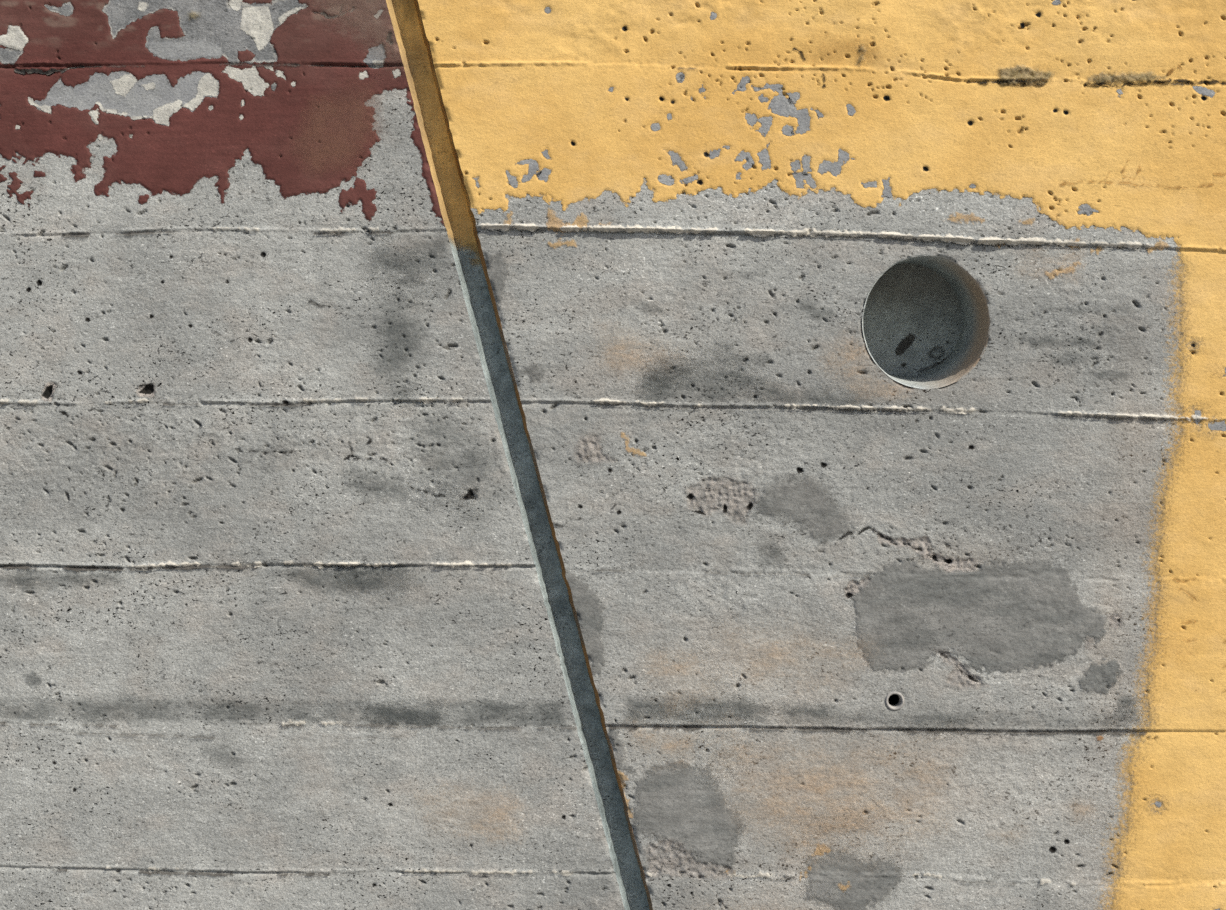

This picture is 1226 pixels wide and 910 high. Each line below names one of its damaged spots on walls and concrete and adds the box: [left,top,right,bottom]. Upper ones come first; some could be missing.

peeling [0,25,28,65]
peeling [28,0,308,140]
peeling [359,32,401,80]
rust [440,96,449,128]
peeling [710,76,824,180]
peeling [506,147,551,188]
peeling [790,148,855,189]
rust [473,220,504,338]
rust [513,379,532,446]
rust [541,492,577,618]
crack [840,527,951,563]
rust [580,637,625,801]